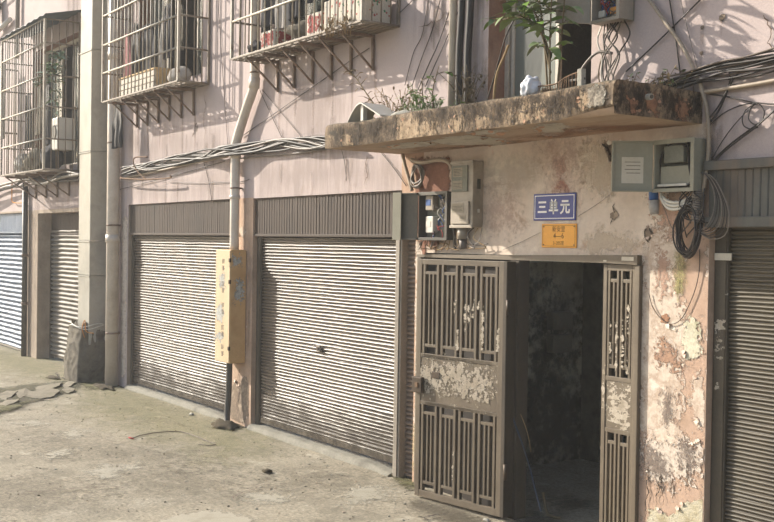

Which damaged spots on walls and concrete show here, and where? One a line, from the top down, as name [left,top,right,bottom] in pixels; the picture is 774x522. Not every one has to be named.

water stain [329,86,583,147]
water stain [614,79,703,120]
peeling [639,192,705,522]
spalling [230,377,249,423]
crack [644,463,688,520]